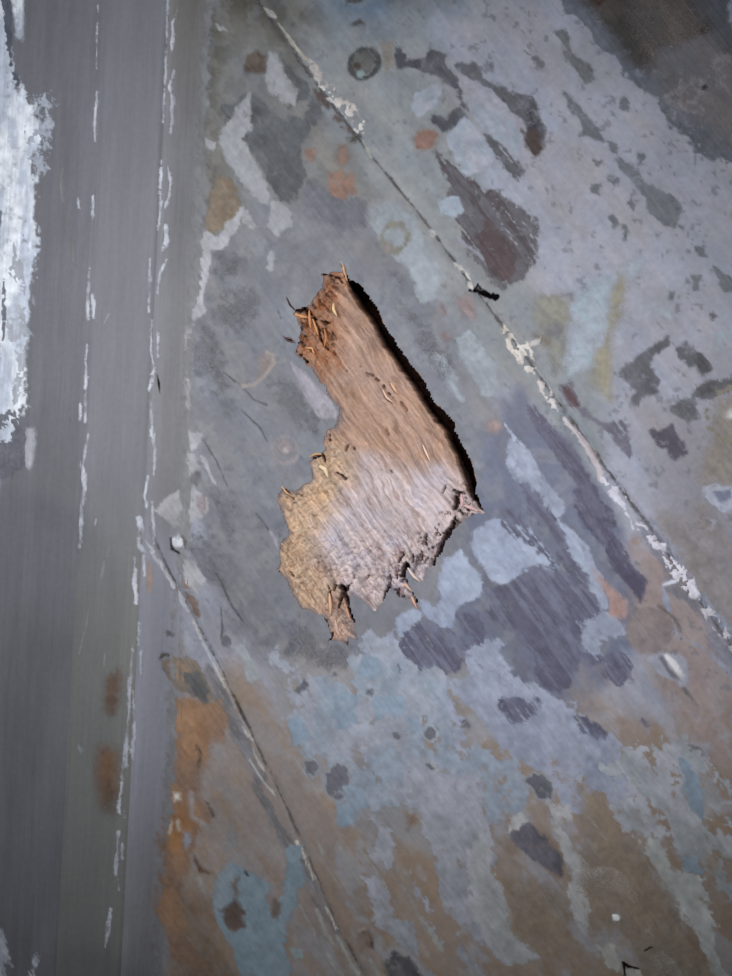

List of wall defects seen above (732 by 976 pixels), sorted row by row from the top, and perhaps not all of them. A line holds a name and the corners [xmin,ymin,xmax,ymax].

peeling [0,0,97,484]
peeling [394,44,548,182]
peeling [434,148,541,293]
crack [256,0,732,651]
peeling [552,28,600,85]
peeling [561,89,686,232]
peeling [560,0,732,164]
peeling [693,244,732,293]
spalling [66,344,97,548]
peeling [131,0,370,906]
spalling [255,263,732,976]
spalling [116,622,143,819]